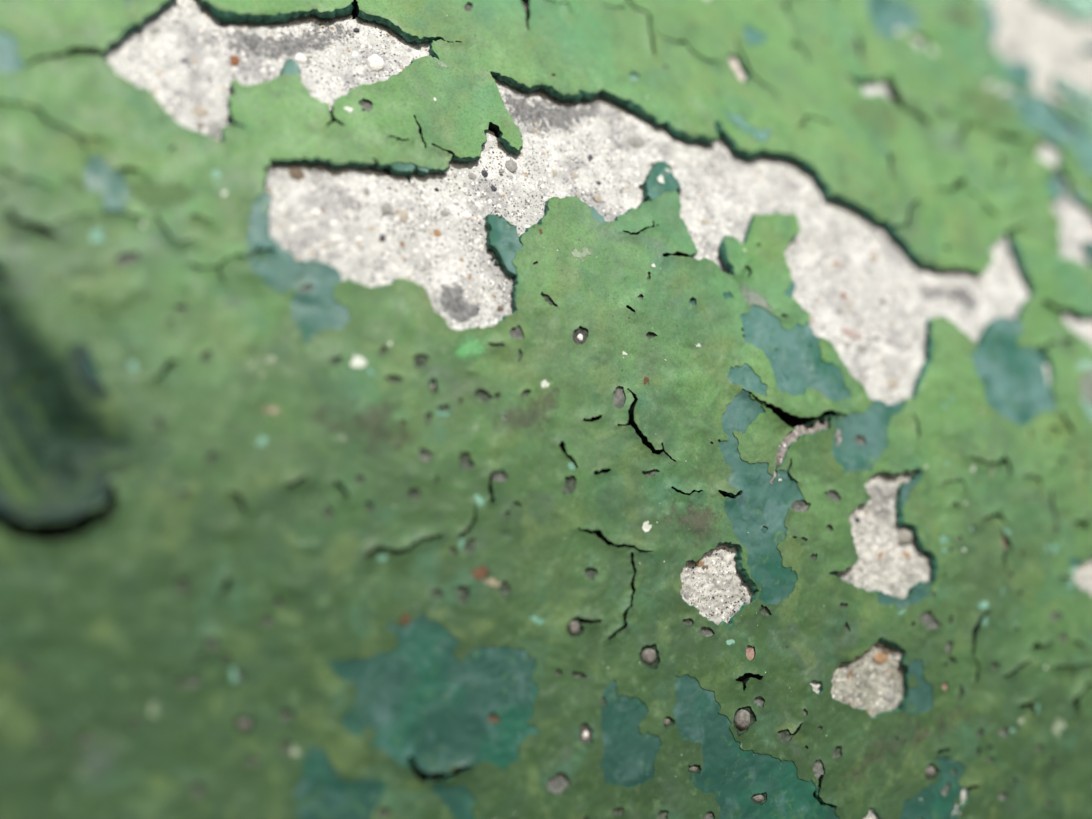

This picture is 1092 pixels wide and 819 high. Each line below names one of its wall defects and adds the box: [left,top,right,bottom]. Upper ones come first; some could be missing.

crack [351,0,360,19]
crack [521,0,571,30]
peeling [102,0,443,141]
crack [848,37,930,124]
peeling [979,0,1092,266]
peeling [240,71,1058,637]
peeling [1056,310,1092,343]
crack [742,388,847,428]
peeling [1067,558,1092,596]
crack [735,673,763,691]
peeling [810,637,964,719]
crack [972,610,1092,715]